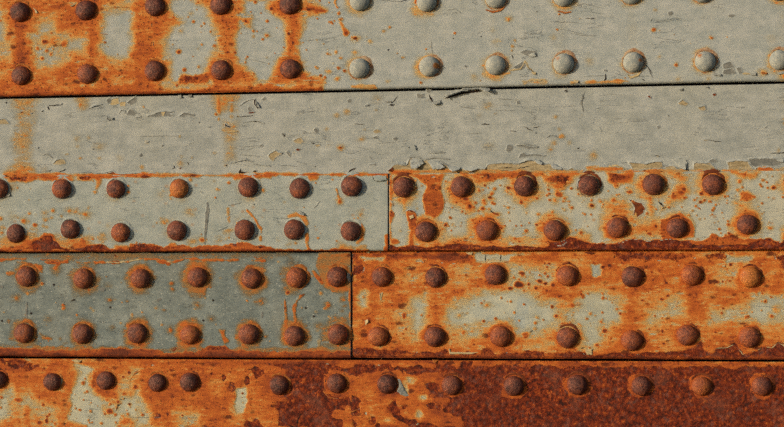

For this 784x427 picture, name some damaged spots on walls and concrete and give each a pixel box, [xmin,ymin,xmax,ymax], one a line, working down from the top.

peeling [106,96,137,117]
rust [0,0,332,156]
peeling [147,109,200,124]
peeling [443,87,490,99]
peeling [259,126,321,162]
peeling [387,143,577,174]
peeling [592,156,784,172]
rust [0,157,784,427]